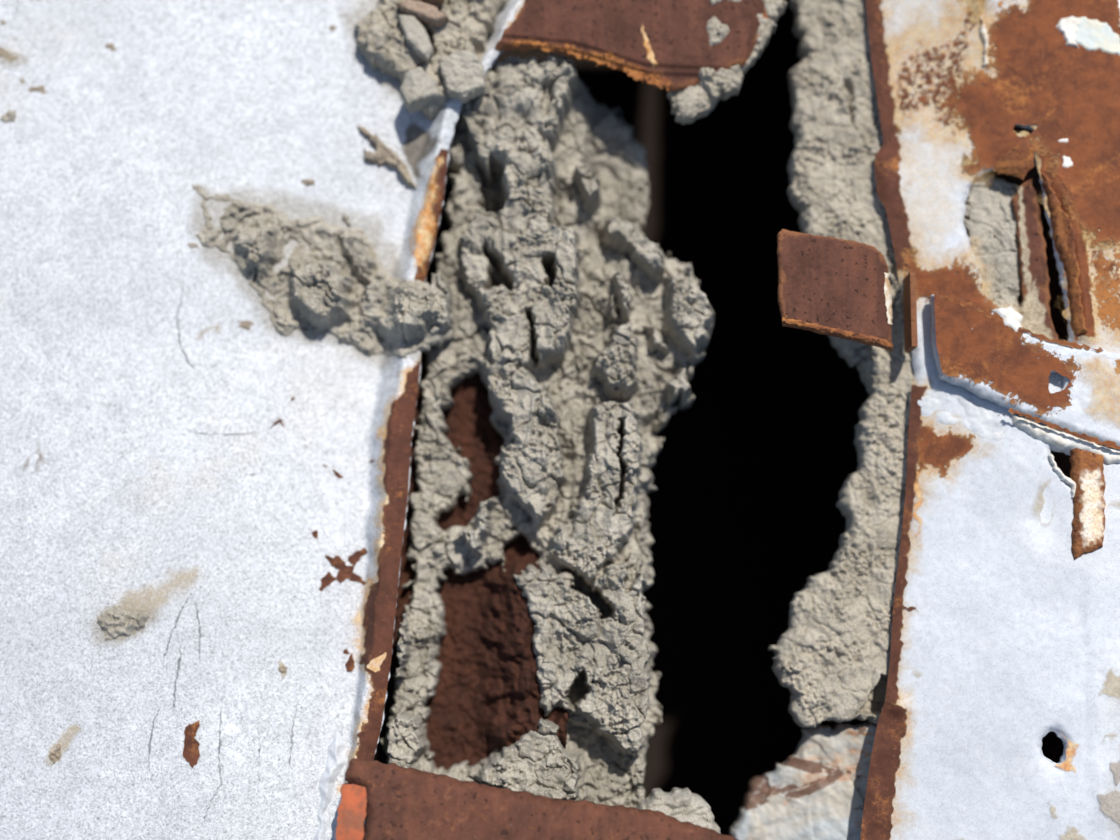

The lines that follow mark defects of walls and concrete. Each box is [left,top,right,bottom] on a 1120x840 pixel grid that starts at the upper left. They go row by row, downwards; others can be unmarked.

corrosion [512,28,673,91]
corrosion [782,317,893,348]
corrosion [865,0,1120,450]
peeling [1056,16,1120,55]
corrosion [339,360,421,790]
corrosion [860,384,976,840]